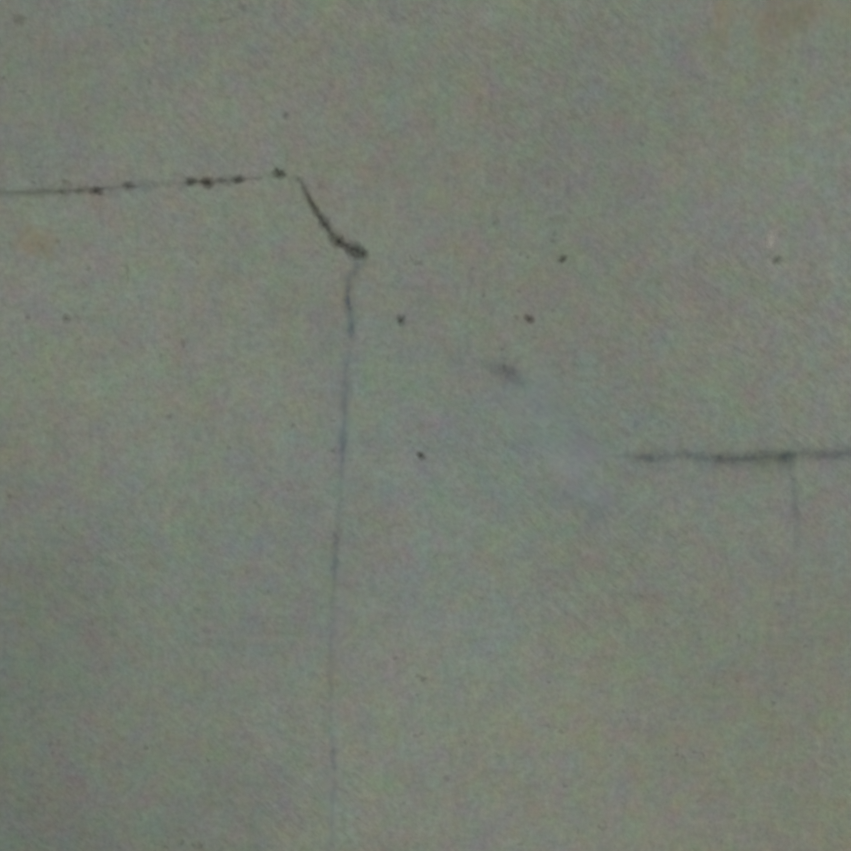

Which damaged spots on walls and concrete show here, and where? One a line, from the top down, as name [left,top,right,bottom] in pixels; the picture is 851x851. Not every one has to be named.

crack [309,199,364,255]